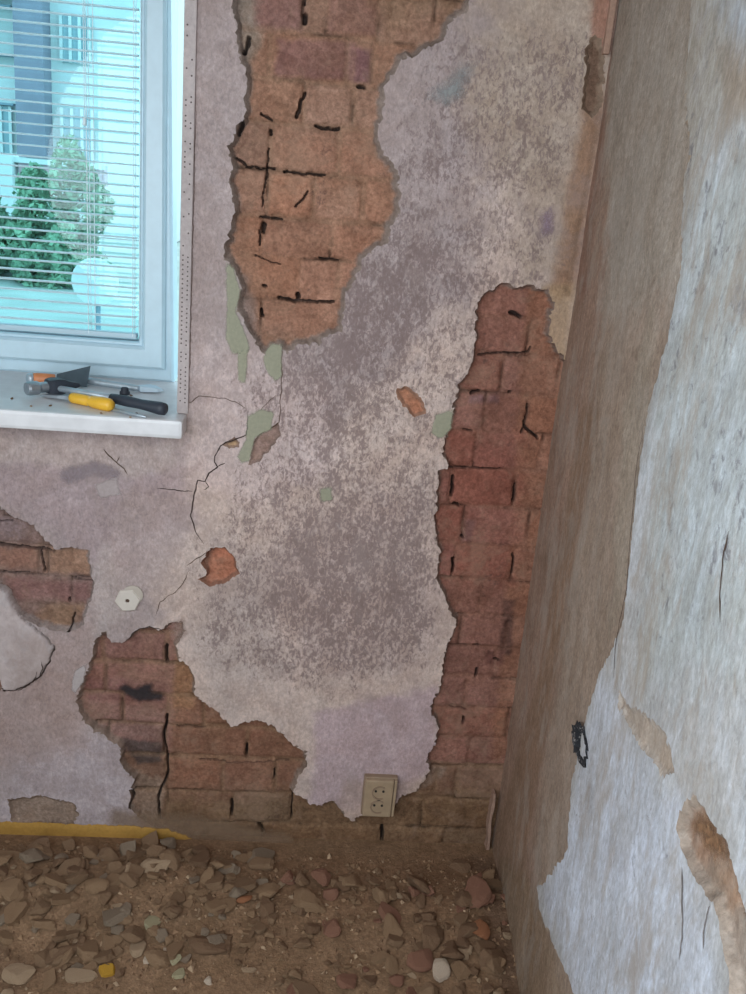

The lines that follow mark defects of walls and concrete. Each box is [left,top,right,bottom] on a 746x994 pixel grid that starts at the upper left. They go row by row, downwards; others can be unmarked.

flaking render [223,0,470,382]
flaking render [0,506,95,691]
crack [128,108,283,640]
flaking render [198,547,240,587]
flaking render [223,437,240,449]
flaking render [248,422,281,465]
flaking render [396,386,426,418]
peeling [426,0,692,994]
flaking render [7,795,79,825]
flaking render [65,968,98,984]
flaking render [75,621,504,844]
flaking render [676,794,745,994]